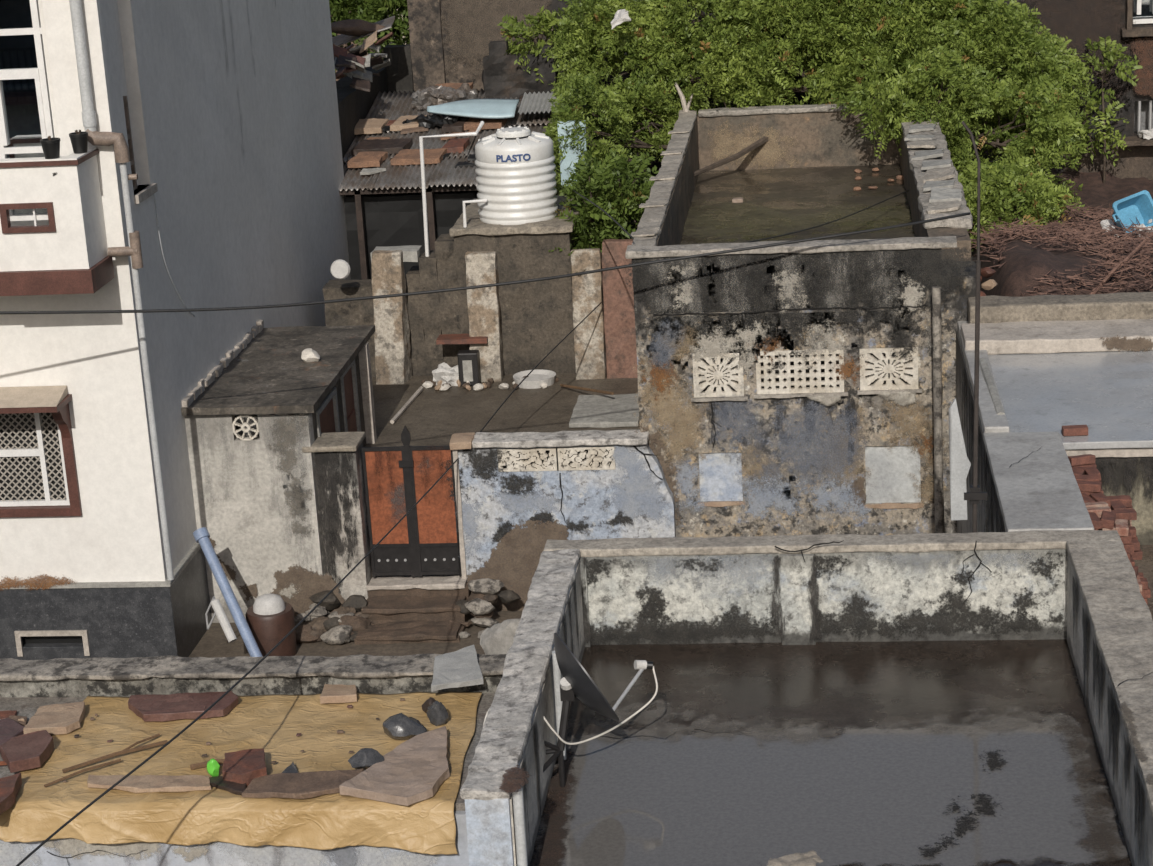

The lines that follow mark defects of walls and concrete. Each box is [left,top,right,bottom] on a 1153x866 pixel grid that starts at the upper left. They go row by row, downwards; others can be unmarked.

peeling [664,260,697,309]
peeling [772,270,809,312]
peeling [689,321,767,377]
spalling [881,262,981,533]
leakage [269,413,366,586]
crack [558,473,566,523]
spalling [457,424,705,611]
peeling [738,407,871,521]
crack [959,541,991,604]
leakage [807,553,1143,861]